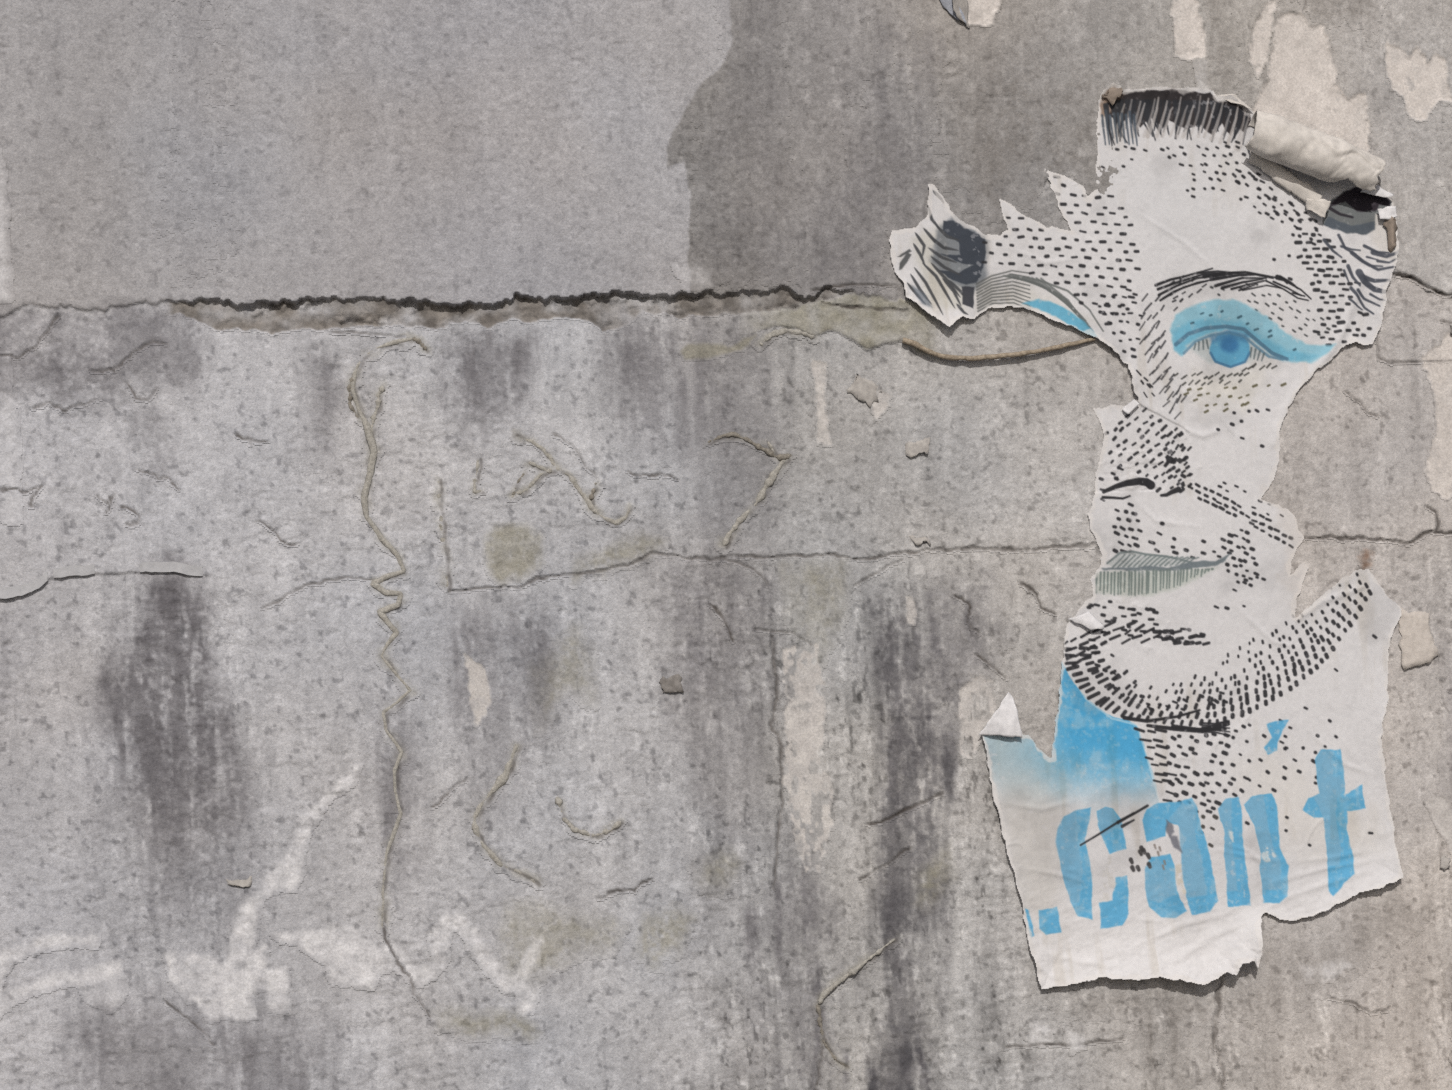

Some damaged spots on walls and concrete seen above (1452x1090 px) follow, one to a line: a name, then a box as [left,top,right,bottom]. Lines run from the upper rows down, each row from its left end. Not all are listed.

peeling [940,0,1002,29]
peeling [1168,0,1208,62]
peeling [1247,0,1372,153]
peeling [1383,38,1452,123]
crack [0,313,61,360]
crack [760,281,909,350]
peeling [1419,325,1452,501]
crack [1303,504,1452,547]
damp [589,313,1017,1090]
damp [75,543,277,953]